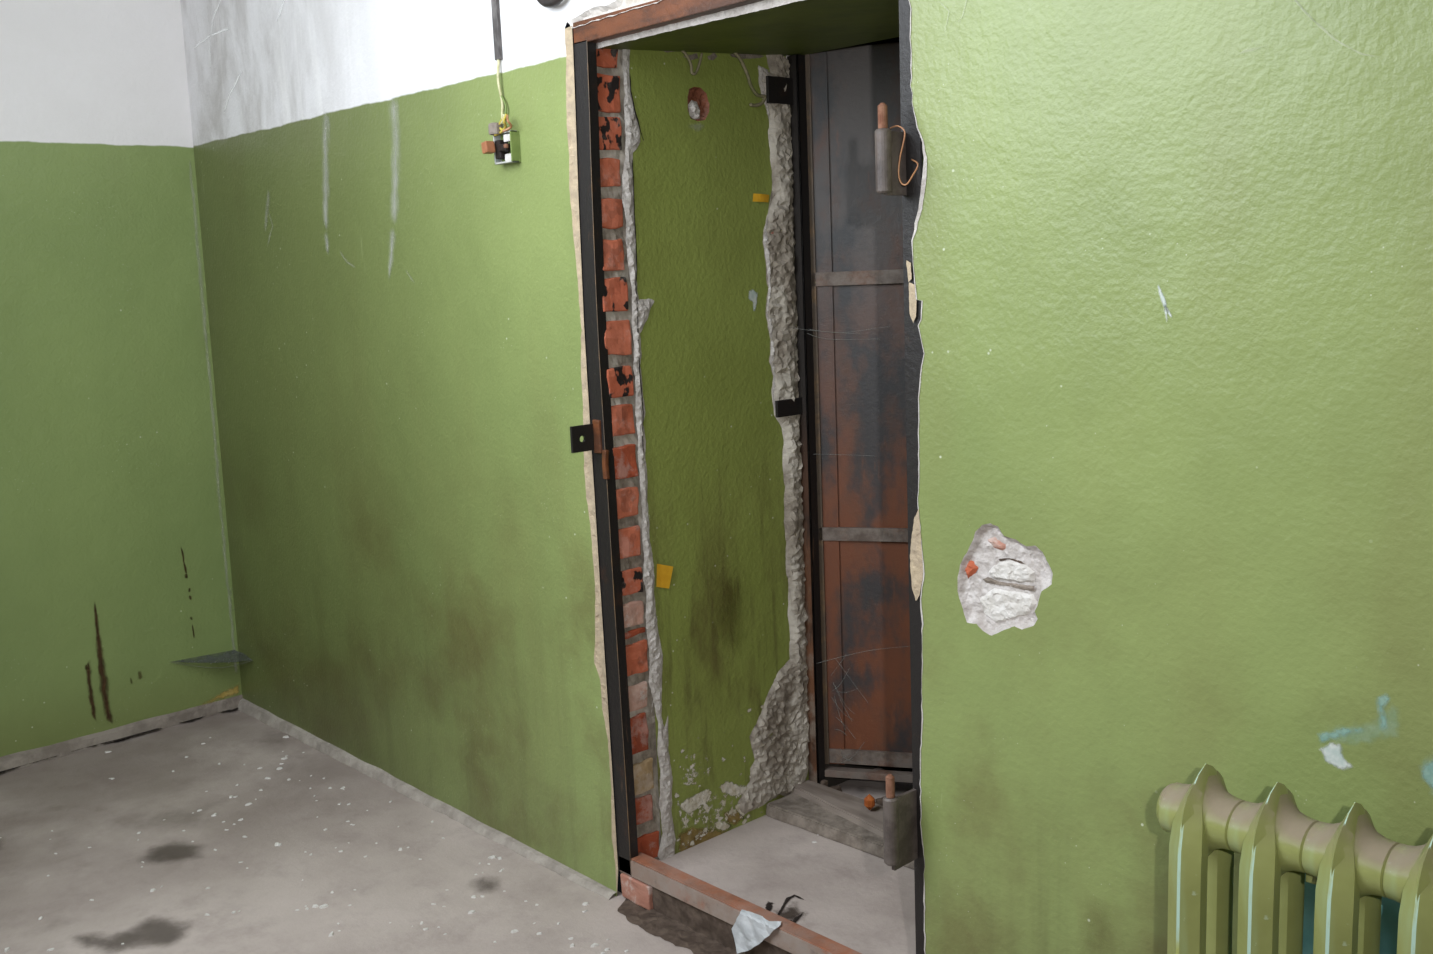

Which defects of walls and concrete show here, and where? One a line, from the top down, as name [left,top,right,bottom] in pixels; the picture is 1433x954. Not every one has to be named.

rust [85,606,112,722]
spalling [584,450,618,888]
spalling [565,0,661,425]
flaking render [596,0,809,861]
spalling [906,1,927,633]
spalling [958,523,1053,636]
peeling [1320,728,1357,769]
peeling [1423,763,1433,787]